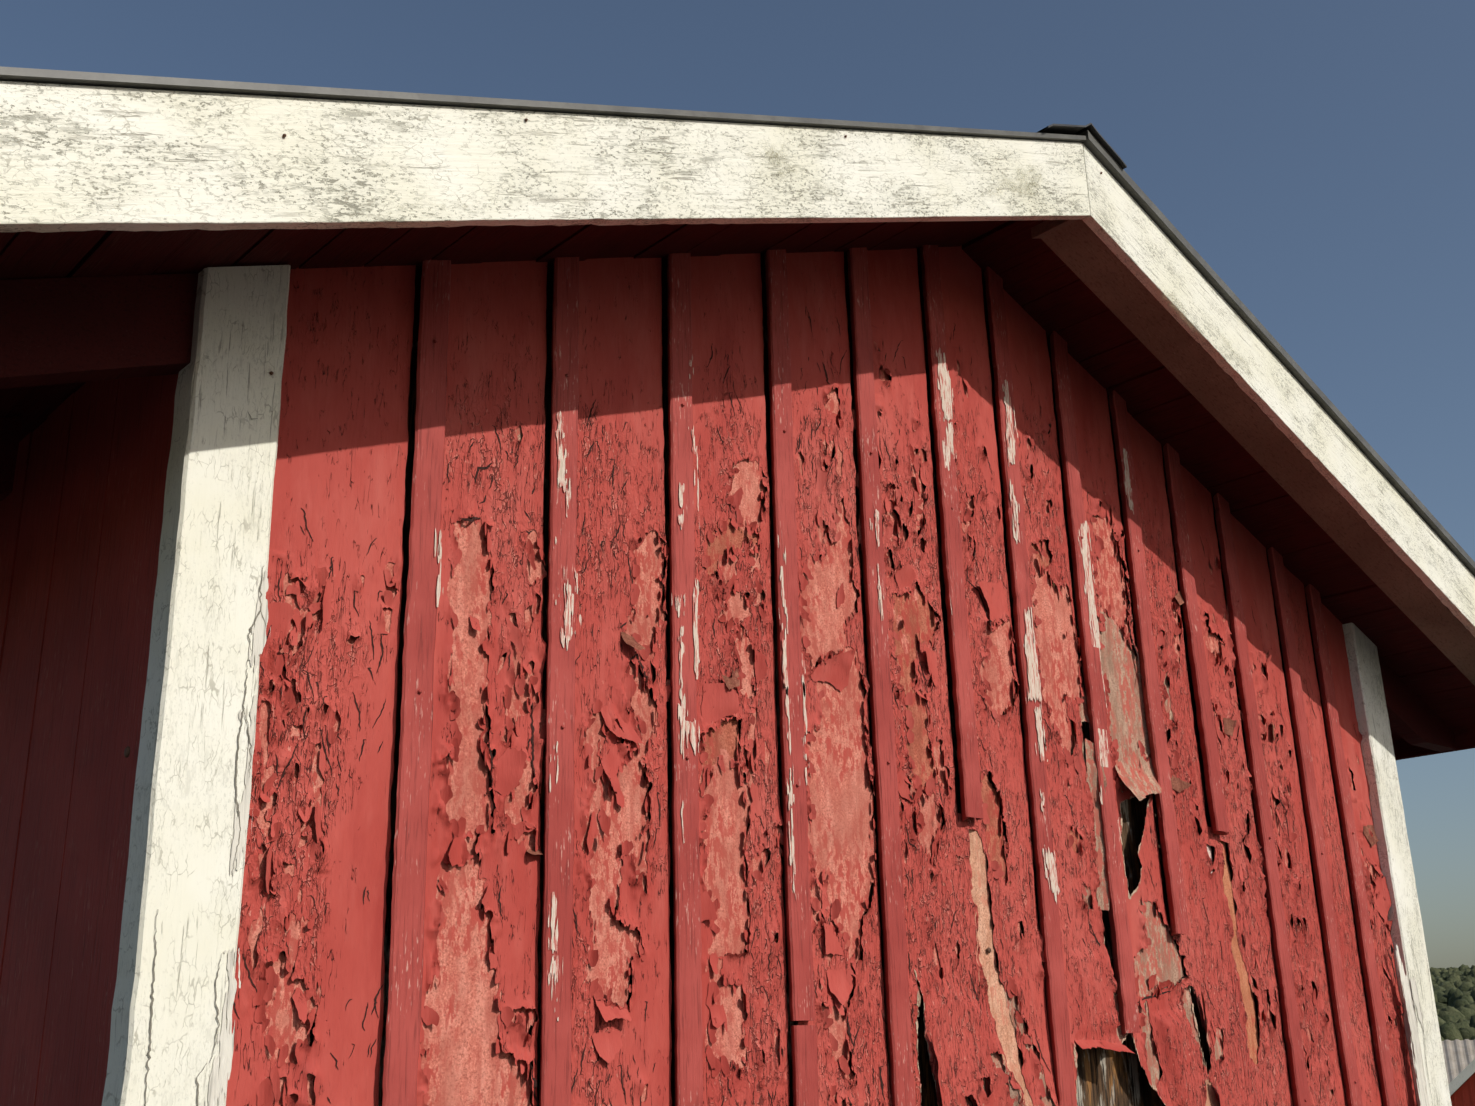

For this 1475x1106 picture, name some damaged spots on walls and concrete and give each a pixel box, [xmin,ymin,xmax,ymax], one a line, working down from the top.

crack [144,912,158,1106]
crack [196,954,257,1106]
peeling [205,567,341,1106]
peeling [419,508,581,1106]
crack [722,1049,783,1106]
crack [749,929,781,1017]
peeling [581,387,952,1106]
crack [814,910,958,1106]
peeling [956,772,1054,1106]
peeling [962,380,1200,911]
peeling [1075,895,1225,1106]
peeling [1360,812,1430,1106]